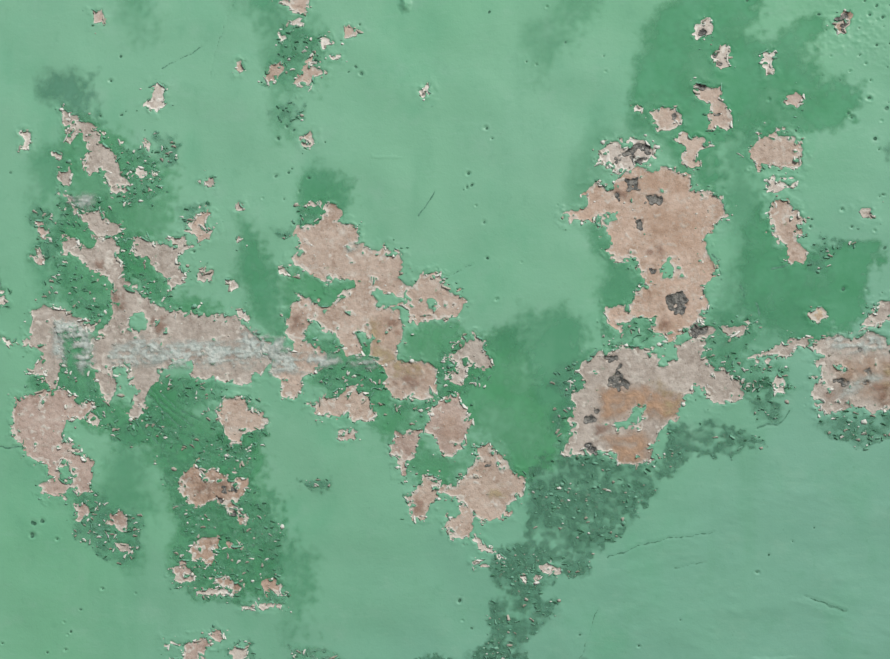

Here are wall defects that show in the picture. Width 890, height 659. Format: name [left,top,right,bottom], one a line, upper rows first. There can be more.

peeling [55,104,181,209]
spalling [120,82,173,116]
spalling [276,101,326,154]
spalling [630,100,683,132]
spalling [690,77,739,135]
water stain [632,0,862,185]
peeling [737,82,856,273]
water stain [603,266,641,308]
water stain [731,189,887,341]
peeling [0,128,890,642]
peeling [161,624,256,659]
peeling [473,600,528,659]